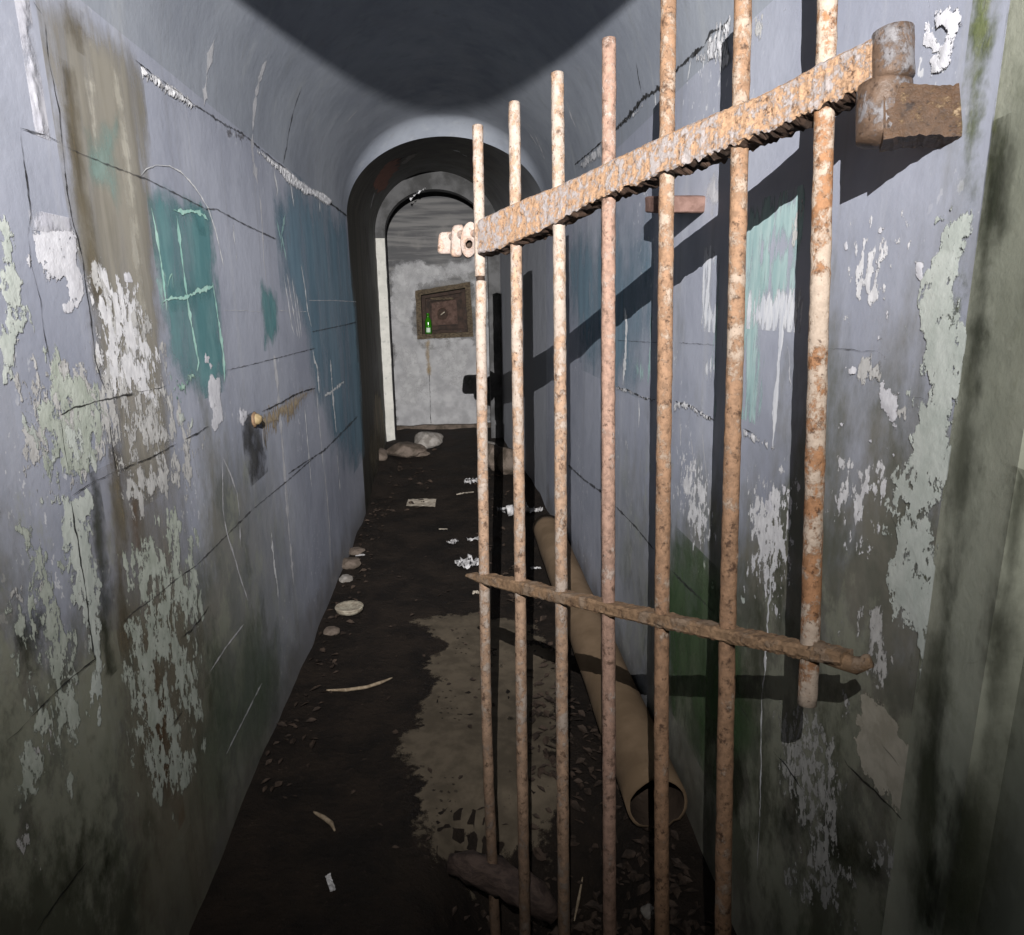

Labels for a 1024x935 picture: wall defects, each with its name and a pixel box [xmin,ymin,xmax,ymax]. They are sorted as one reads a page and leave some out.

crack [575,17,730,165]
peeling [923,5,962,76]
leakage [968,0,992,95]
crack [2,1,275,745]
leakage [43,14,385,583]
peeling [0,215,223,820]
leakage [102,610,128,673]
leakage [143,532,199,885]
peeling [673,453,716,550]
peeling [741,458,800,618]
peeling [773,206,973,931]
peeling [16,824,32,855]